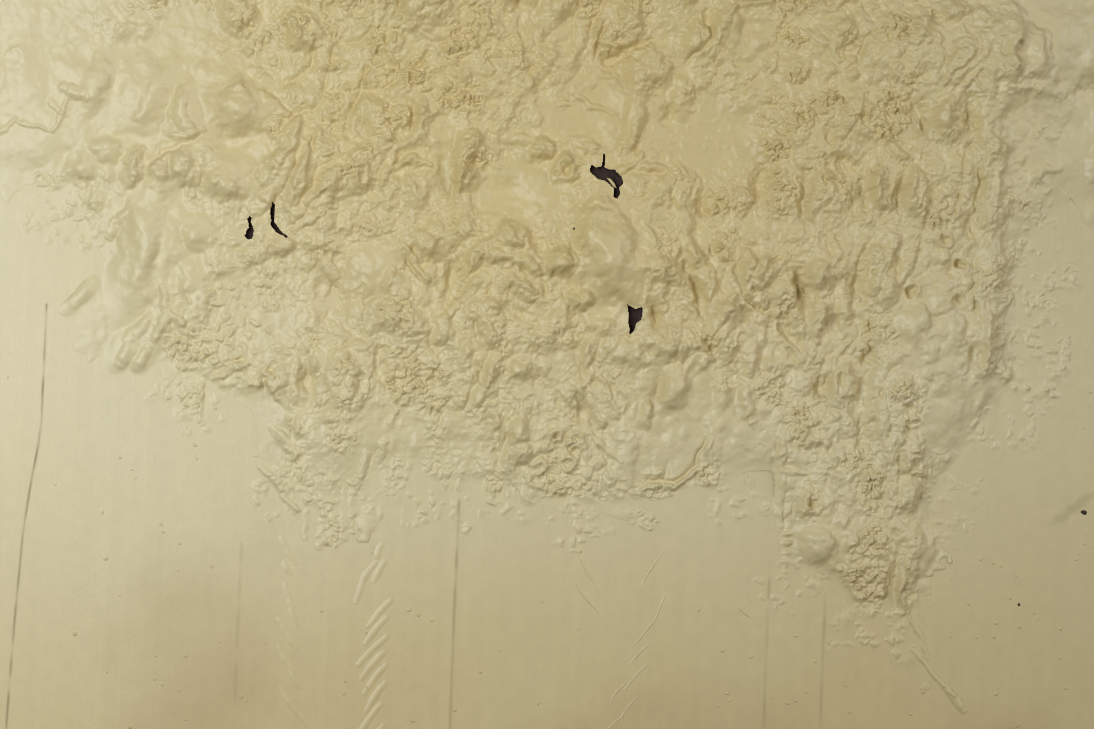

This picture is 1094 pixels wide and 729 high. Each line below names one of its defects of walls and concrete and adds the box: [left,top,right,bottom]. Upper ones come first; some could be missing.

spalling [90,0,664,521]
spalling [542,0,1094,654]